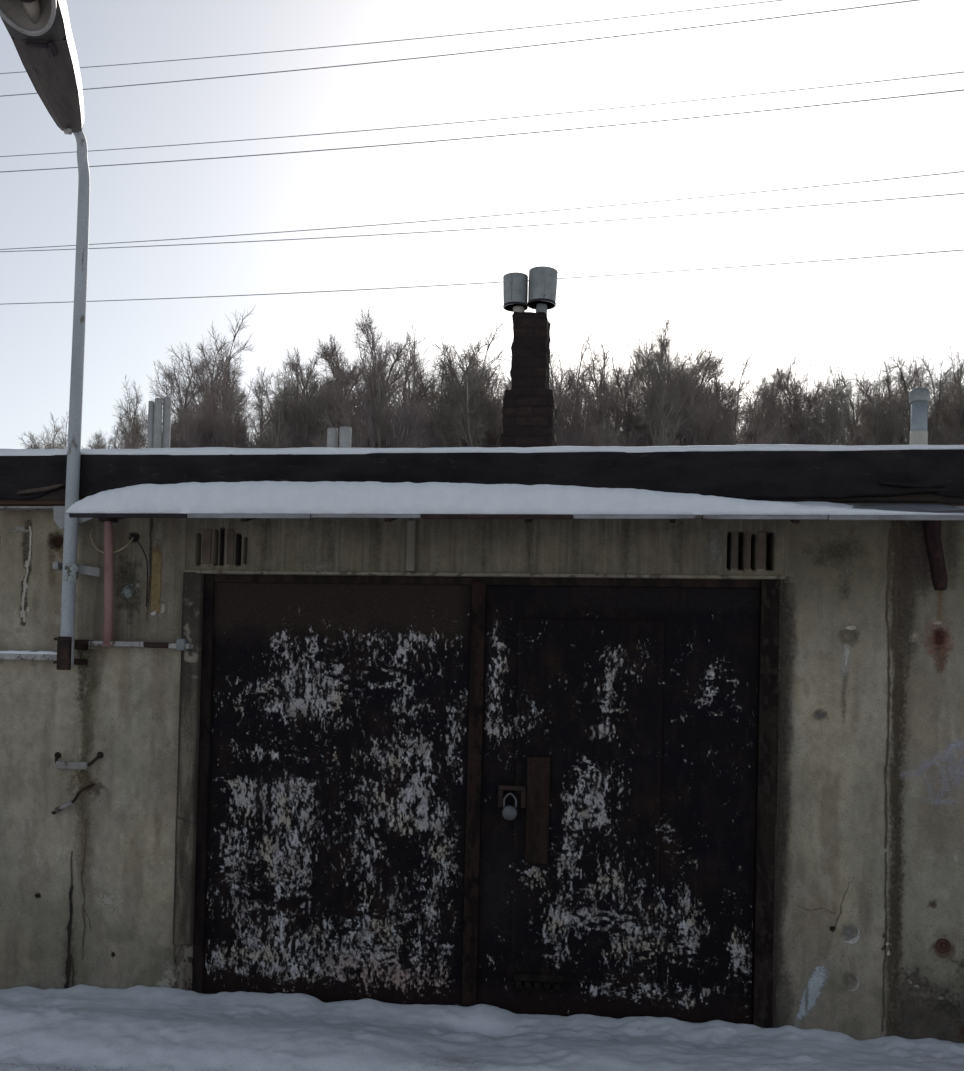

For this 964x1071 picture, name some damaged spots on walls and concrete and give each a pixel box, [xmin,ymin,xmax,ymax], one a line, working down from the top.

water stain [898,520,930,657]
peeling [484,620,546,742]
peeling [585,645,649,746]
peeling [695,659,748,716]
peeling [205,625,468,998]
water stain [772,577,795,1028]
peeling [509,756,725,1009]
peeling [727,922,753,983]
crack [802,882,850,933]